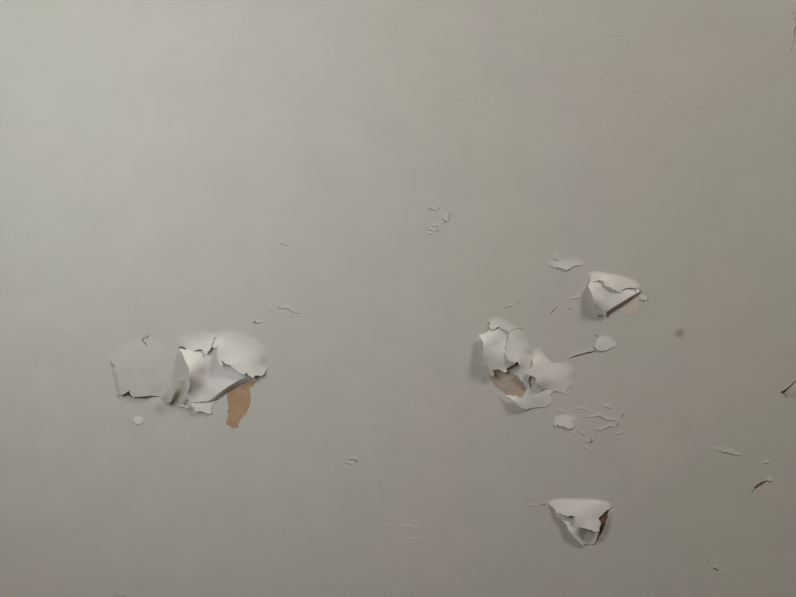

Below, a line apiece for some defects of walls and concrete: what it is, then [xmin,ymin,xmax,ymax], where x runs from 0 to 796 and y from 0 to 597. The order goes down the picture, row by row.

peeling [545,250,647,317]
peeling [105,328,270,428]
peeling [479,316,619,410]
peeling [541,492,615,546]